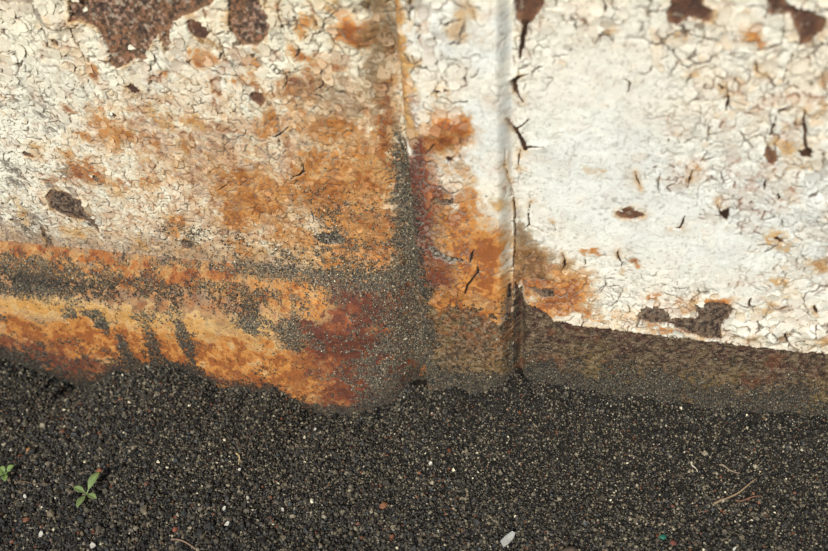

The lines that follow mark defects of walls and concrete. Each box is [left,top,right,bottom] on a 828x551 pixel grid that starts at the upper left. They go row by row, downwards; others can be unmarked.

peeling [0,0,295,253]
peeling [247,40,461,279]
peeling [344,0,464,109]
corrosion [0,0,828,416]
peeling [406,107,473,190]
crack [460,250,479,294]
crack [513,194,531,257]
crack [513,19,538,170]
peeling [509,0,630,45]
peeling [518,54,828,352]
peeling [659,0,828,91]
crack [801,111,810,151]